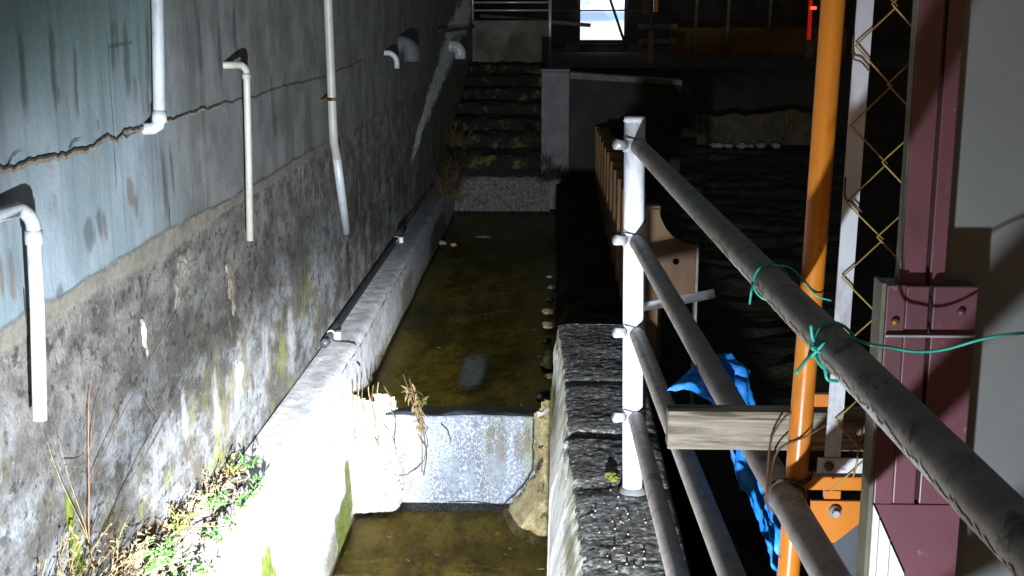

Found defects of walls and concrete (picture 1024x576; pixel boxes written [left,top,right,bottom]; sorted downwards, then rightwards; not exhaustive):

crack [0,25,364,175]
water stain [66,494,85,576]
water stain [335,460,353,562]
spalling [349,391,404,515]